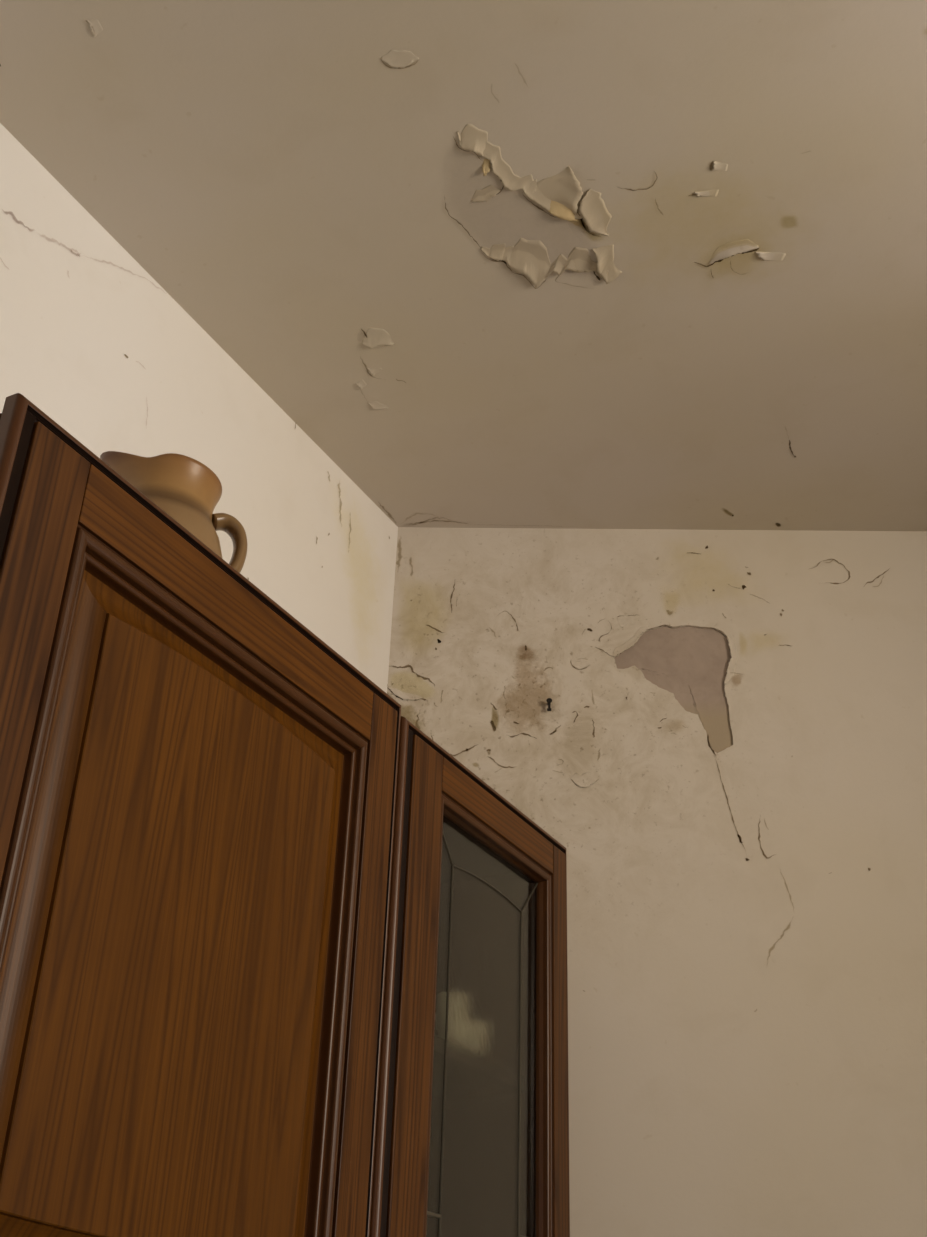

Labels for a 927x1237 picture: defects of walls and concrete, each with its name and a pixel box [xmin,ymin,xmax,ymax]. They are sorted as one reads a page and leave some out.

peeling [445,124,622,289]
flaking render [610,625,738,755]
crack [717,764,770,861]